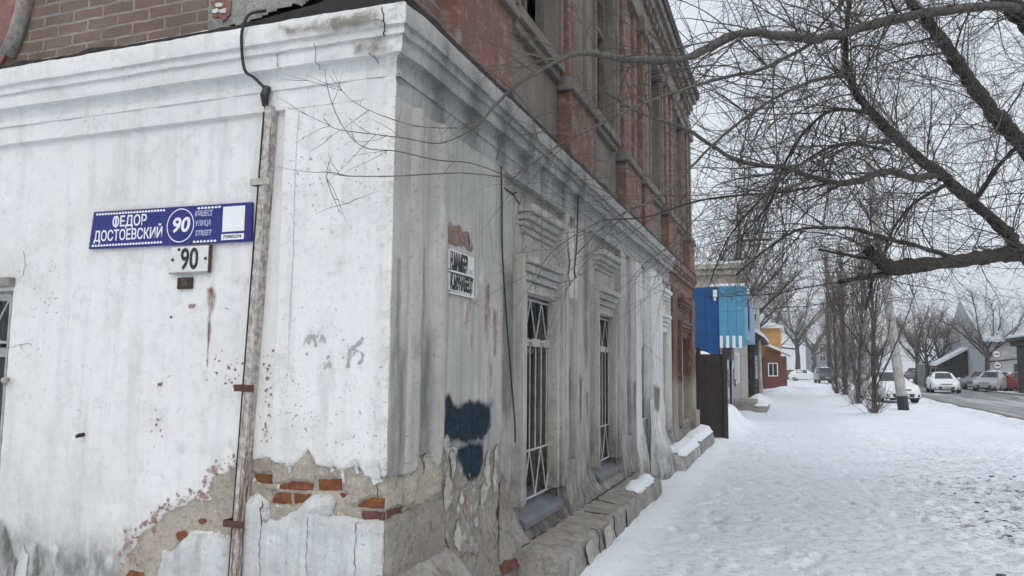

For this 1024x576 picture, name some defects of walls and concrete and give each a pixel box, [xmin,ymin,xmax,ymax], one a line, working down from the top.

flaking render [448,221,474,253]
flaking render [118,454,236,576]
crack [258,501,268,566]
flaking render [250,434,520,576]